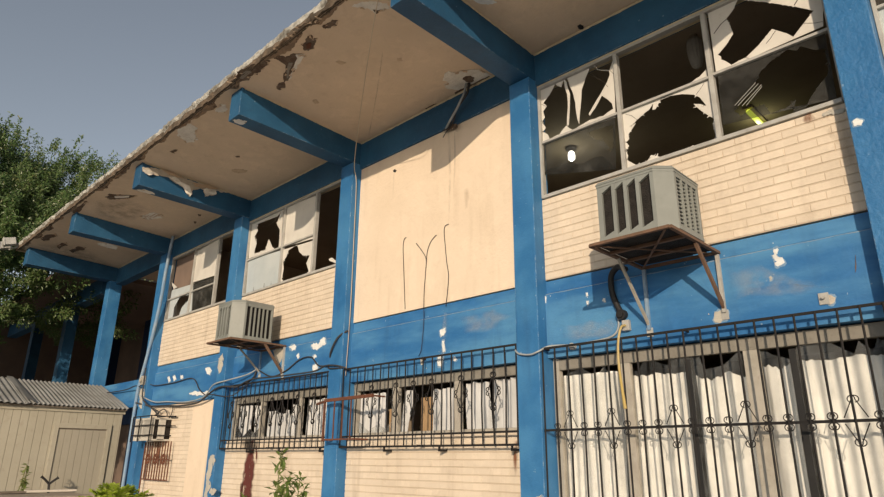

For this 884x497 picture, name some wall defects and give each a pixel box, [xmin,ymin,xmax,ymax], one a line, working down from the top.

peeling [443,69,492,90]
spalling [19,0,390,254]
peeling [766,246,787,282]
peeling [708,308,730,324]
peeling [273,344,300,364]
peeling [310,337,327,373]
peeling [436,327,459,368]
rust [240,440,257,497]